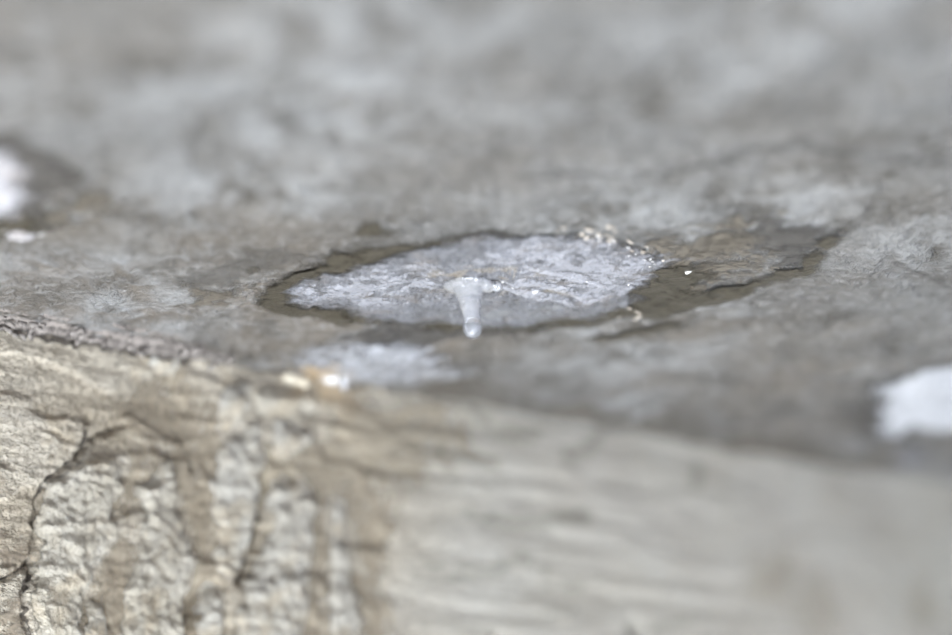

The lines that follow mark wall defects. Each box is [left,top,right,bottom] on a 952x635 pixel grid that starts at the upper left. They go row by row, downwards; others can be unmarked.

damp [0,132,119,241]
crack [0,426,112,635]
damp [79,539,138,635]
damp [92,368,227,635]
damp [175,211,952,635]